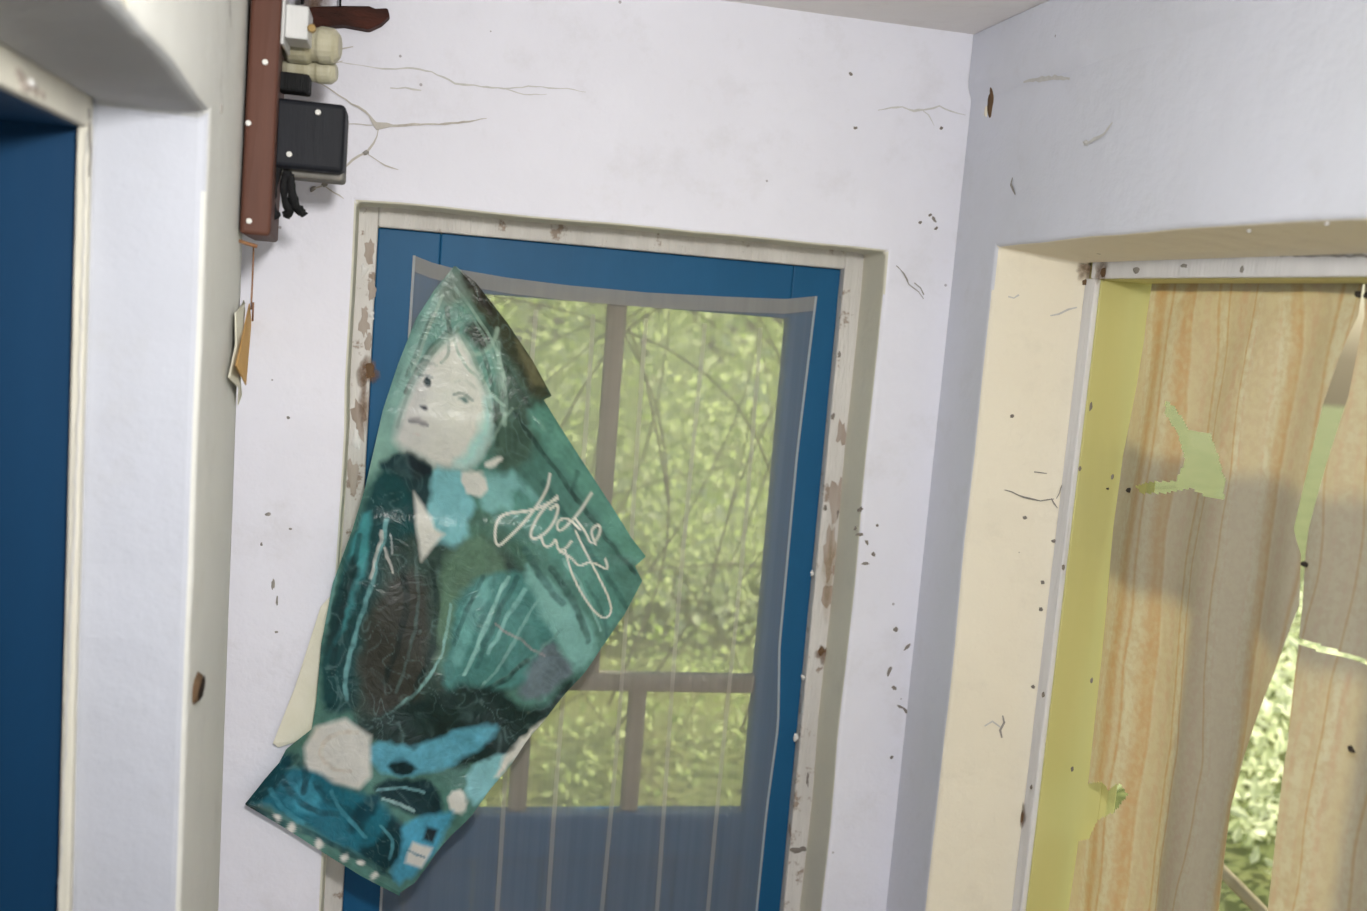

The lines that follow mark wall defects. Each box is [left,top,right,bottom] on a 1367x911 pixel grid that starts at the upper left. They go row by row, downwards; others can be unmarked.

crack [340,62,583,95]
crack [880,105,965,125]
peeling [831,413,847,446]
peeling [810,477,842,609]